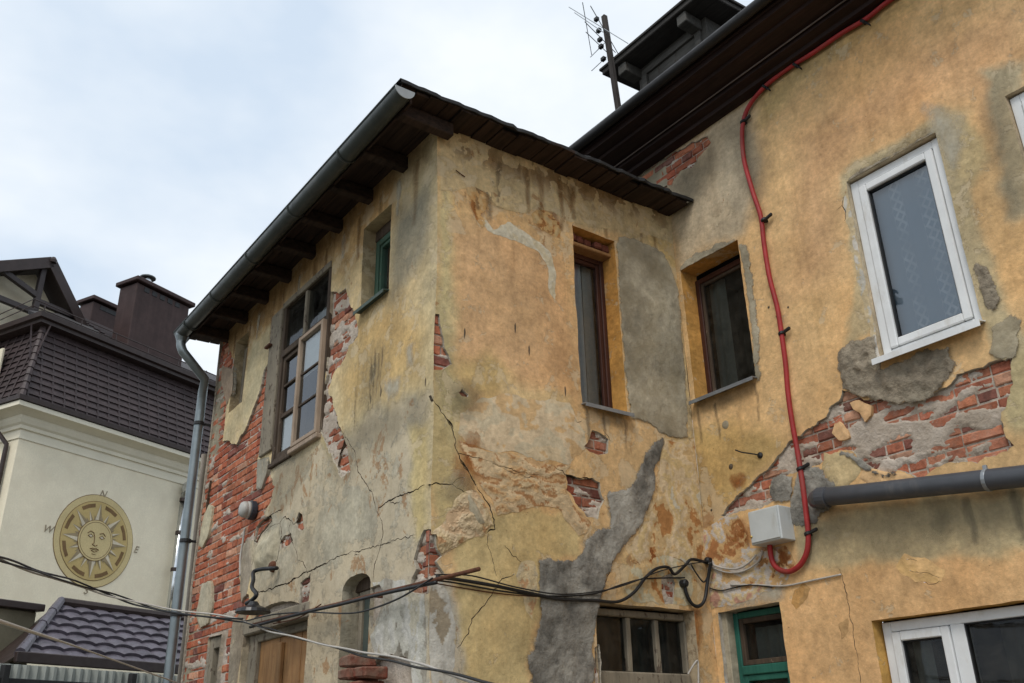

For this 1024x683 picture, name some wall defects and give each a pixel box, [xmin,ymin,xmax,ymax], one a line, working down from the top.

peeling [439,133,673,299]
flaking render [638,136,711,188]
flaking render [181,341,311,683]
flaking render [321,288,358,478]
crack [259,395,592,647]
flaking render [425,314,452,385]
peeling [458,387,609,536]
flaking render [624,358,1014,609]
peeling [369,529,458,683]